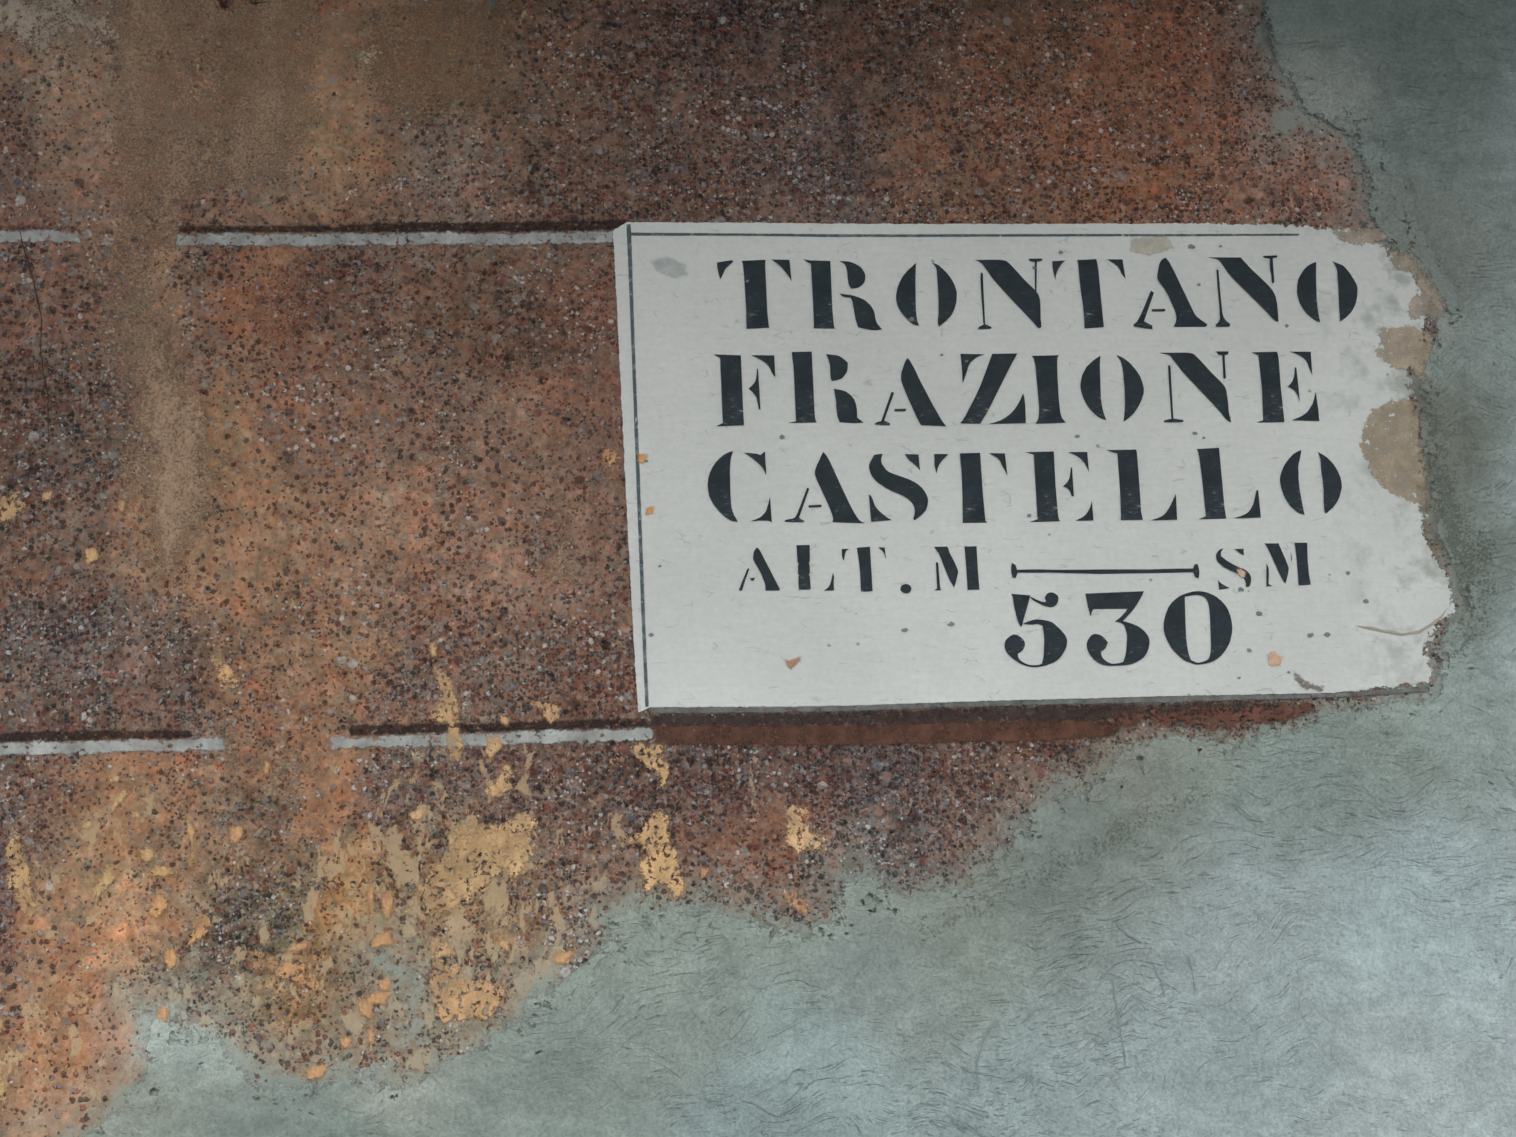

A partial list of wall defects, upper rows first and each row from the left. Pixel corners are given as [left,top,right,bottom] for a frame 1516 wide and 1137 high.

spalling [1332,226,1448,385]
spalling [1359,398,1429,505]
peeling [430,642,464,760]
peeling [531,701,560,724]
peeling [485,716,514,797]
peeling [631,743,669,787]
peeling [416,812,538,921]
peeling [628,811,685,899]
peeling [786,805,827,853]
peeling [164,915,211,969]
peeling [246,942,328,992]
peeling [426,939,505,1024]